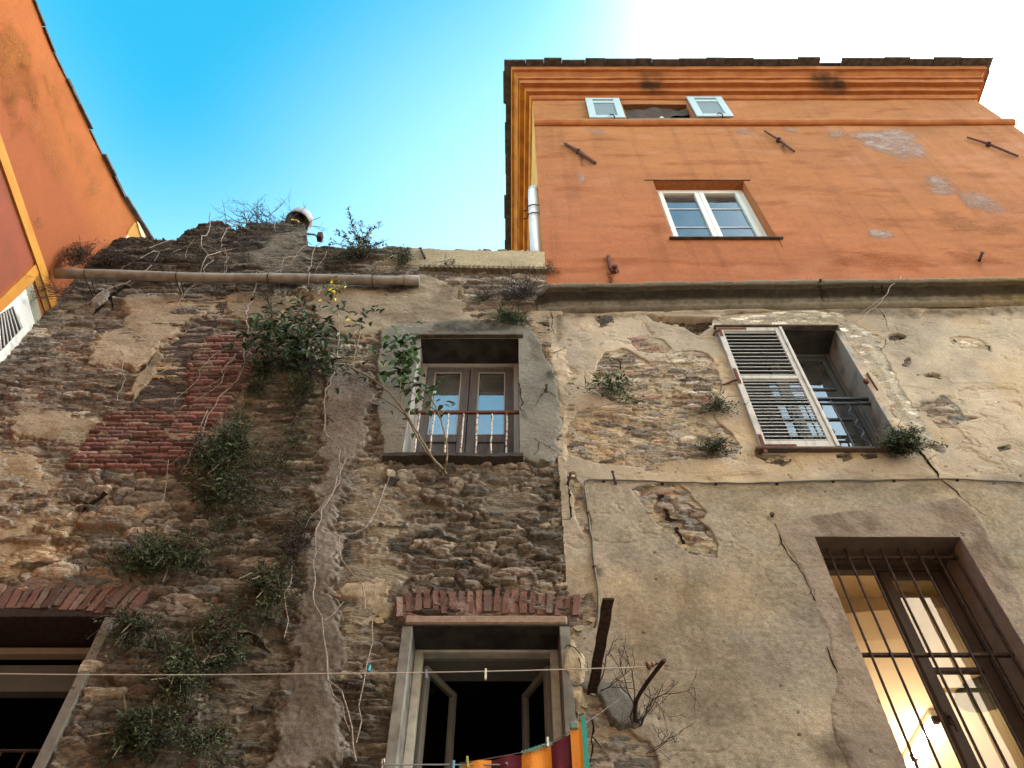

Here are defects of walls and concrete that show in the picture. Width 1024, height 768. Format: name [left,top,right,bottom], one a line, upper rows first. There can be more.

peeling [856,130,923,157]
flaking render [88,274,507,400]
flaking render [659,309,978,453]
flaking render [162,419,195,442]
flaking render [523,310,791,535]
crack [561,482,572,520]
flaking render [632,484,717,558]
crack [917,449,983,514]
crack [774,524,816,601]